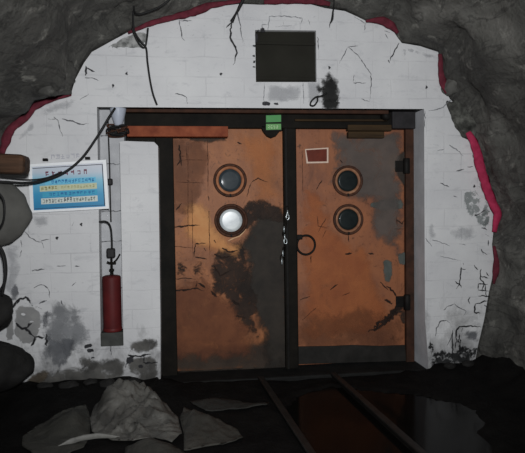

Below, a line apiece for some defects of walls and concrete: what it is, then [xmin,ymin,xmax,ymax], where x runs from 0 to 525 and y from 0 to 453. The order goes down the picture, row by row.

crack [226,14,243,65]
rust [186,205,237,252]
damp [465,192,489,226]
crack [426,239,489,360]
crack [15,323,48,346]
damp [42,305,124,383]